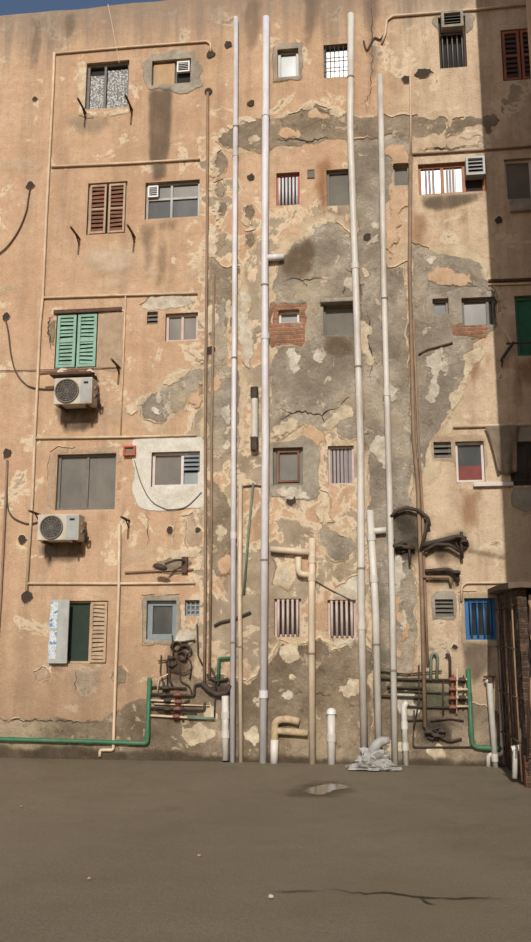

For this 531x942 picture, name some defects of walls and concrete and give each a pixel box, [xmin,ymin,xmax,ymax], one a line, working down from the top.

damp [150,89,171,177]
damp [286,241,313,274]
crack [283,270,377,372]
flaking render [0,100,506,767]
crack [275,397,348,422]
crack [272,889,515,905]